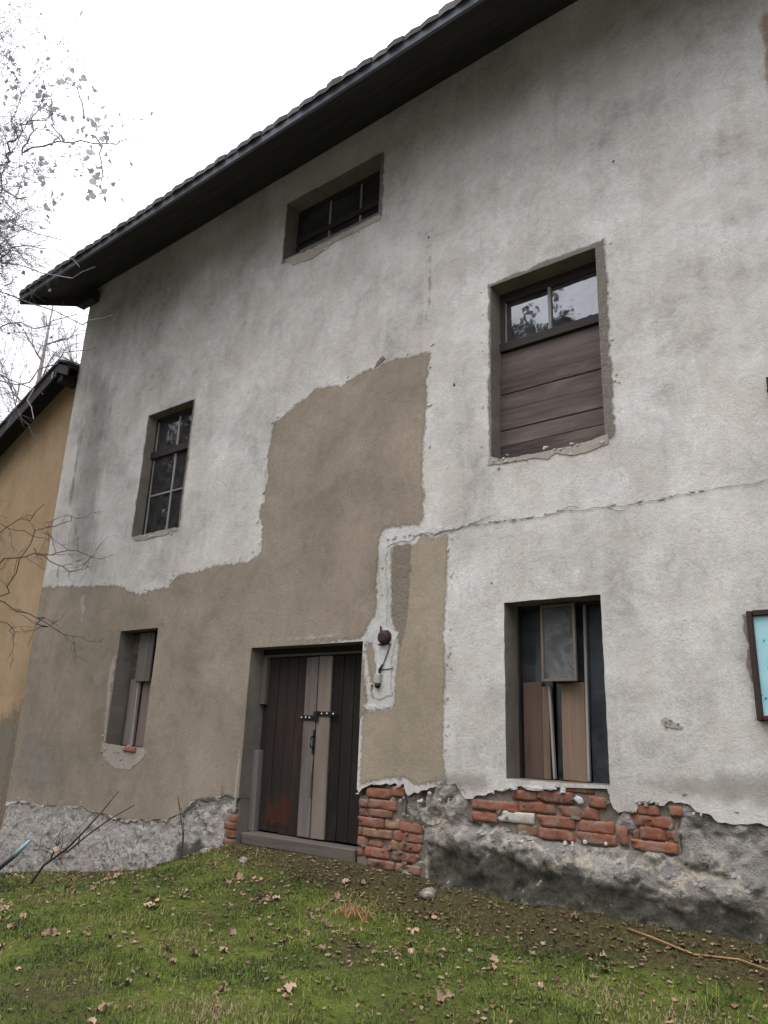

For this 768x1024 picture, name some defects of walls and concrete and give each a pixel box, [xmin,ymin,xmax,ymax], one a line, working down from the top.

peeling [0,343,768,944]
crack [422,479,768,536]